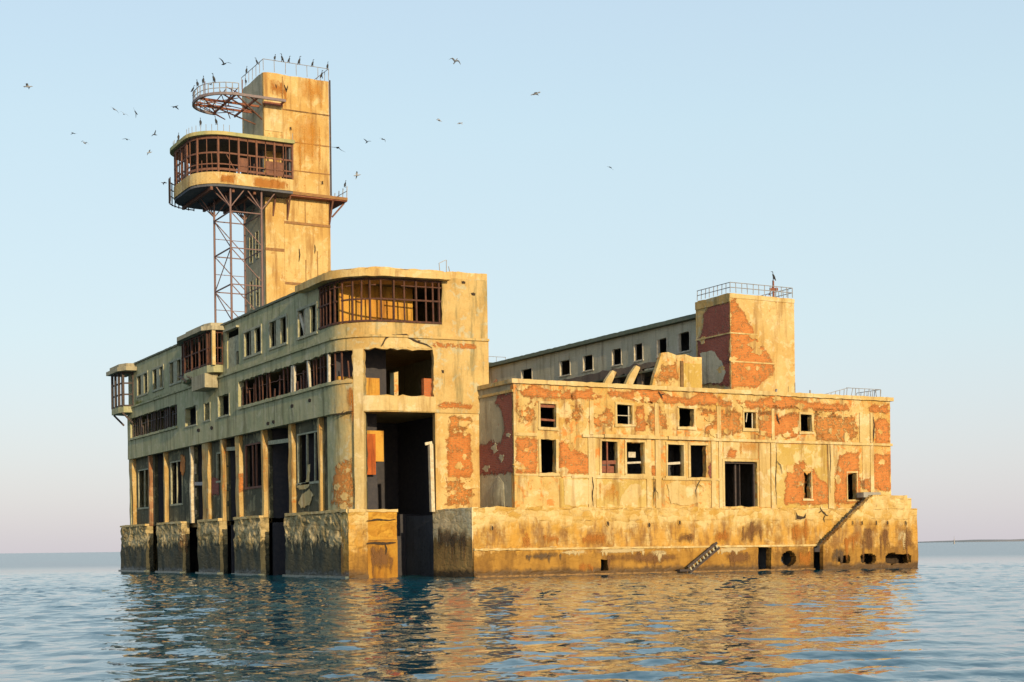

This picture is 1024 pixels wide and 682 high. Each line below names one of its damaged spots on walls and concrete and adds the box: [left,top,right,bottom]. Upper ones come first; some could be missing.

peeling [438,299,891,521]
peeling [331,458,355,509]
water stain [125,530,185,551]
water stain [294,527,344,554]
water stain [526,546,584,562]
water stain [601,549,675,568]
water stain [717,547,748,567]